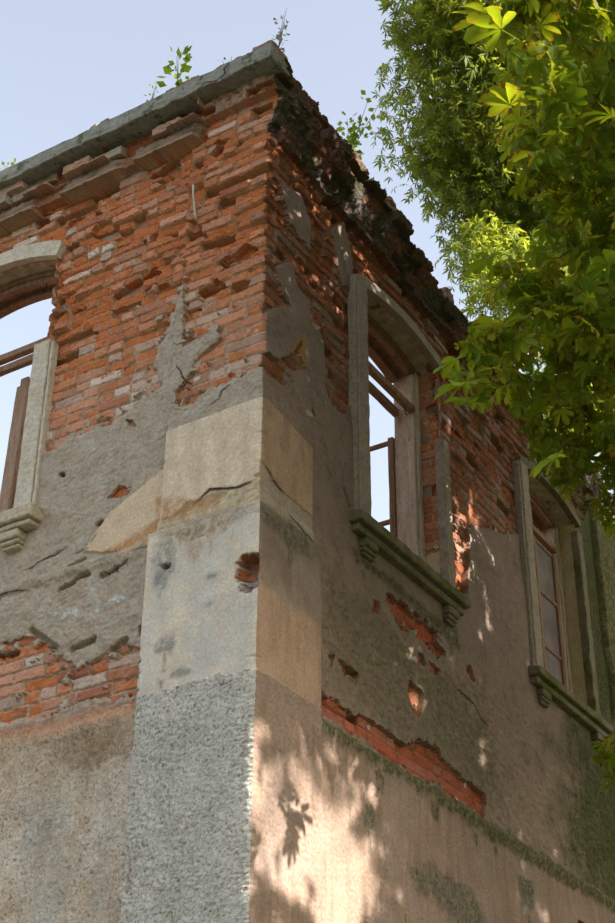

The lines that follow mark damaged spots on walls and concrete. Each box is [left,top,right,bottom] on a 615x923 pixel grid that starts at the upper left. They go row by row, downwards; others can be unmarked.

flaking render [0,88,537,732]
crack [175,466,283,516]
flaking render [321,691,487,819]
crack [453,684,488,726]